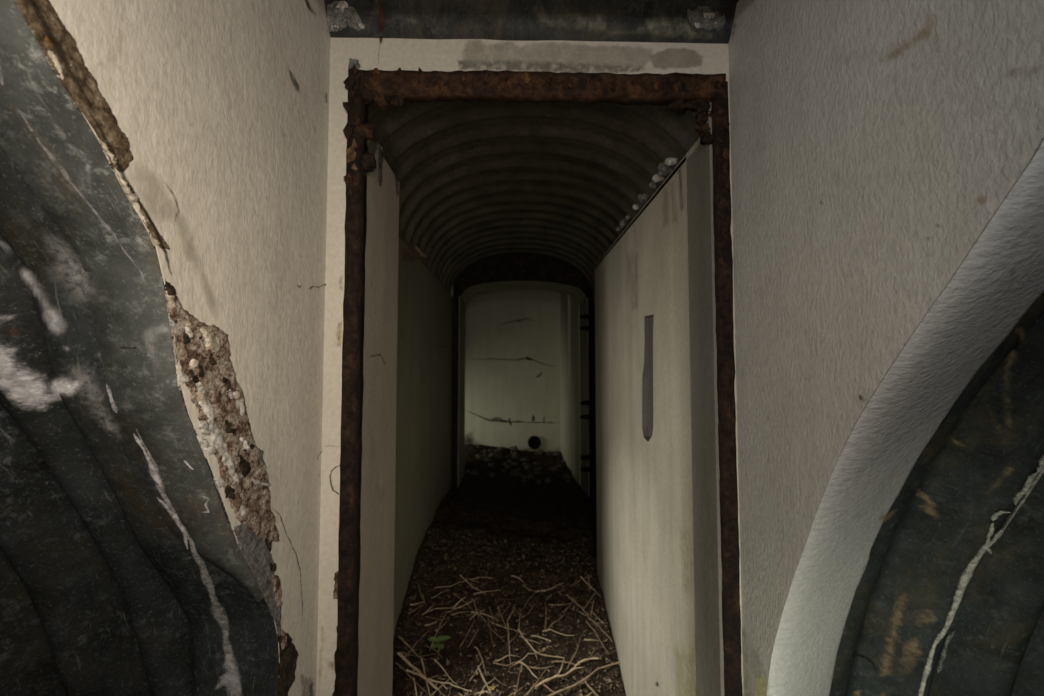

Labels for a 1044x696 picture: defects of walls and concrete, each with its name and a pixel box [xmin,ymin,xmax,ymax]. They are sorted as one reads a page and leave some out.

water stain [624,49,702,69]
flaking render [14,0,170,252]
rust [343,64,360,199]
rust [721,149,730,190]
crack [468,411,556,425]
flaking render [164,280,299,696]
rust [883,597,919,673]